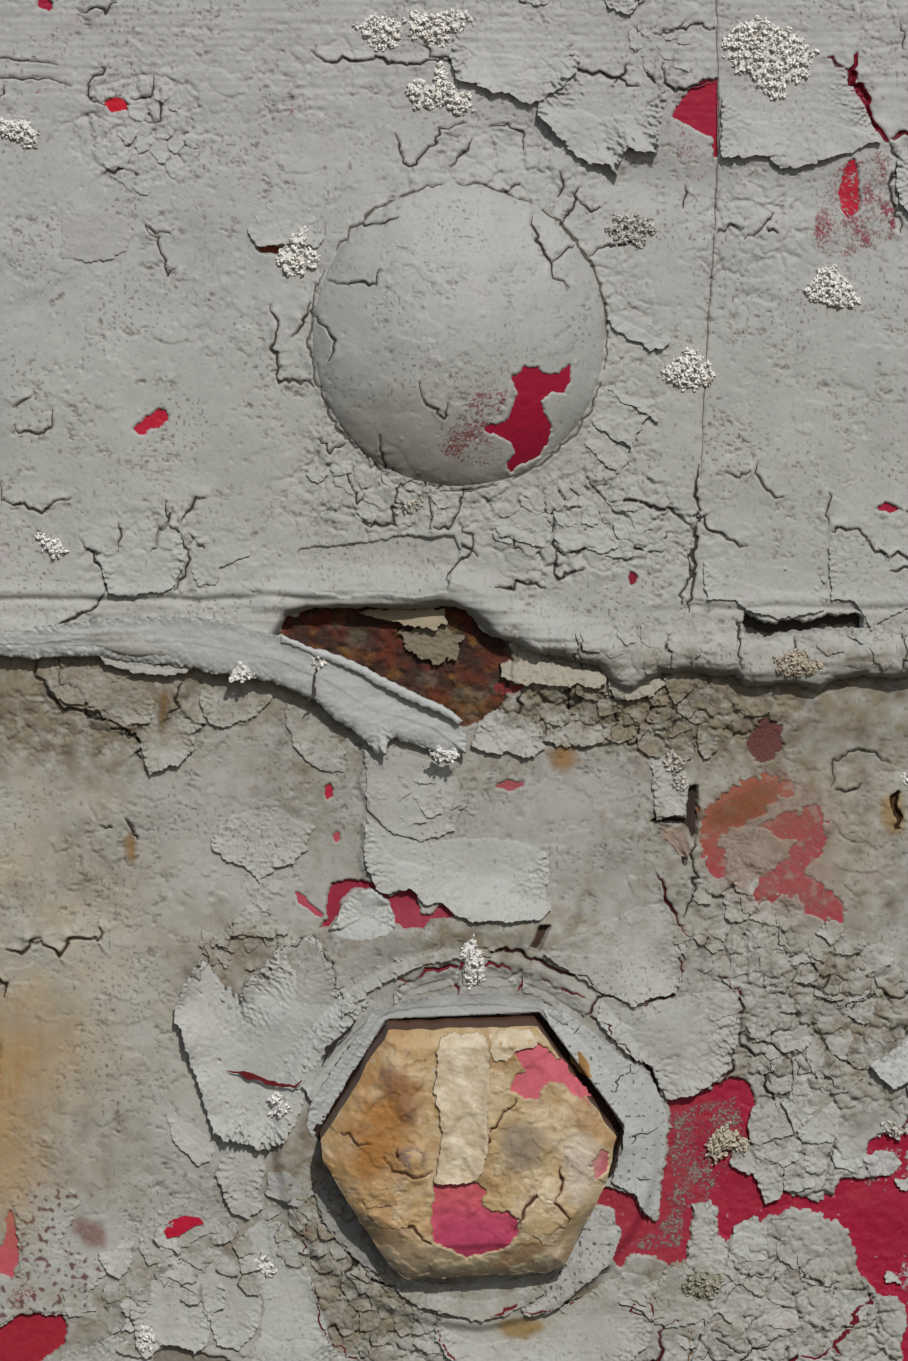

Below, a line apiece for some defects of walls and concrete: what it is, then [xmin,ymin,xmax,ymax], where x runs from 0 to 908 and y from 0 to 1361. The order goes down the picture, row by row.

crack [0,57,162,123]
peeling [449,0,908,255]
crack [827,52,908,233]
peeling [95,515,250,597]
corrosion [278,606,512,727]
peeling [439,365,570,472]
crack [269,0,784,670]
peeling [492,386,665,585]
peeling [703,532,908,671]
crack [0,928,103,998]
peeling [0,615,908,1361]
crack [397,840,699,1144]